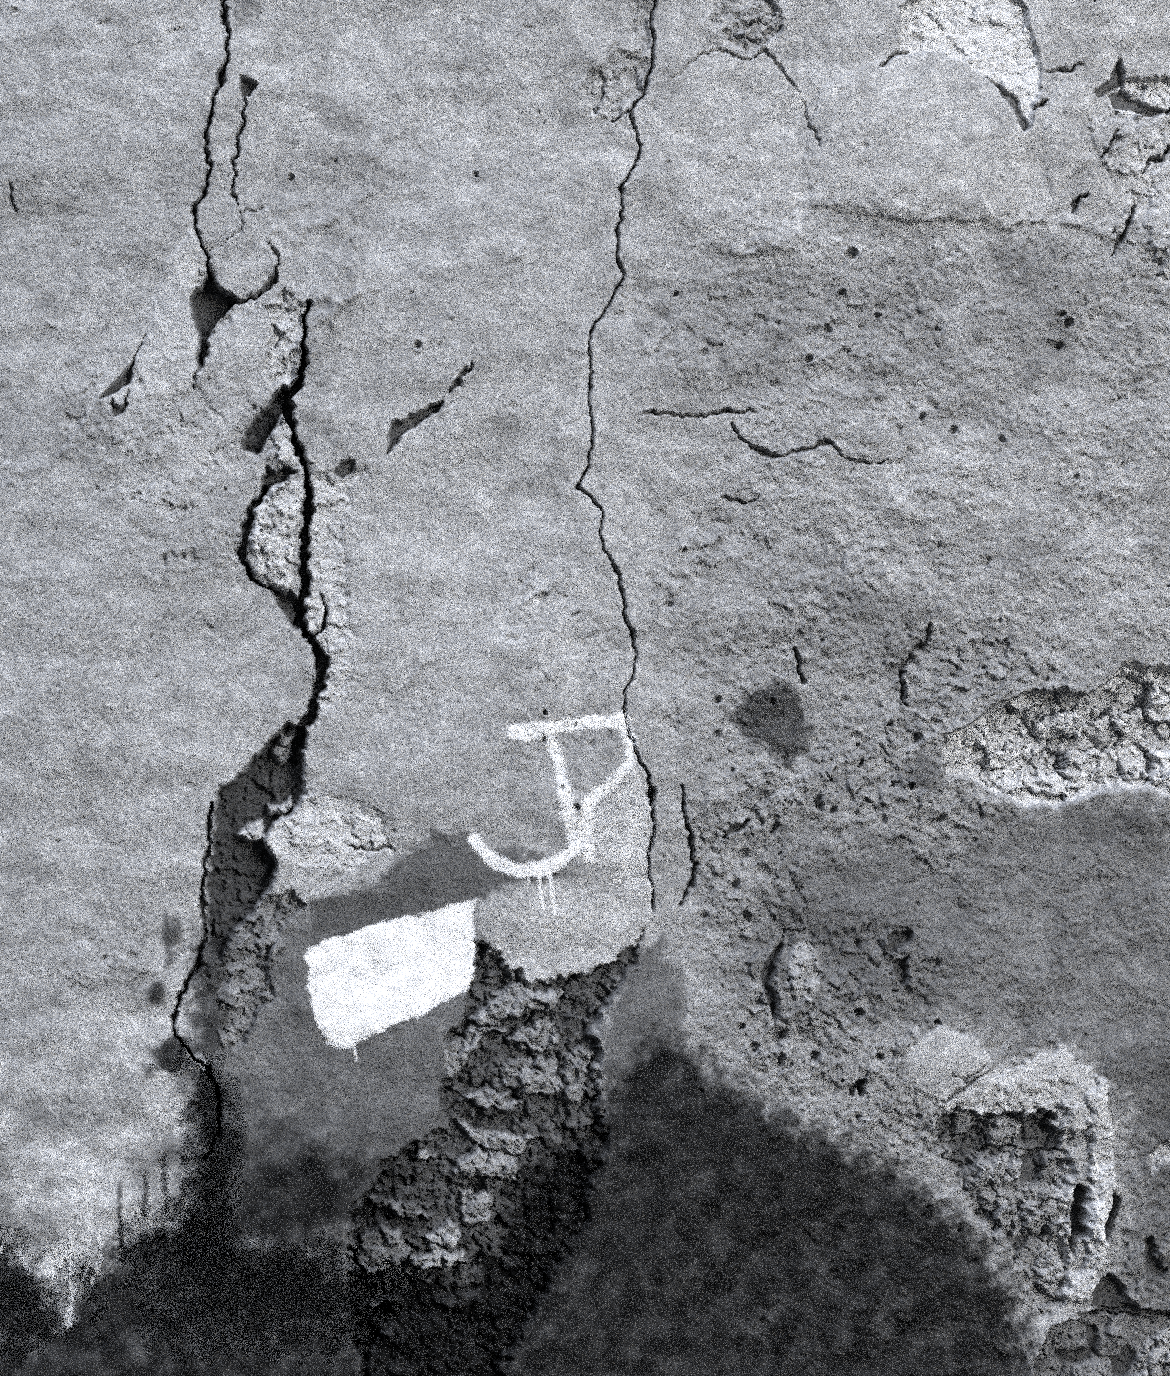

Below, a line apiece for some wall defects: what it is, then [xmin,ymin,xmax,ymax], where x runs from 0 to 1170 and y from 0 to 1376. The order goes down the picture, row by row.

spalling [879,0,1083,132]
spalling [1094,61,1170,121]
crack [190,0,280,387]
crack [236,300,330,731]
crack [575,0,750,911]
crack [721,495,759,505]
crack [644,408,873,465]
spalling [170,459,399,1129]
spalling [941,659,1170,811]
crack [886,930,912,986]
crack [849,1079,866,1098]
peeling [905,1023,1170,1318]